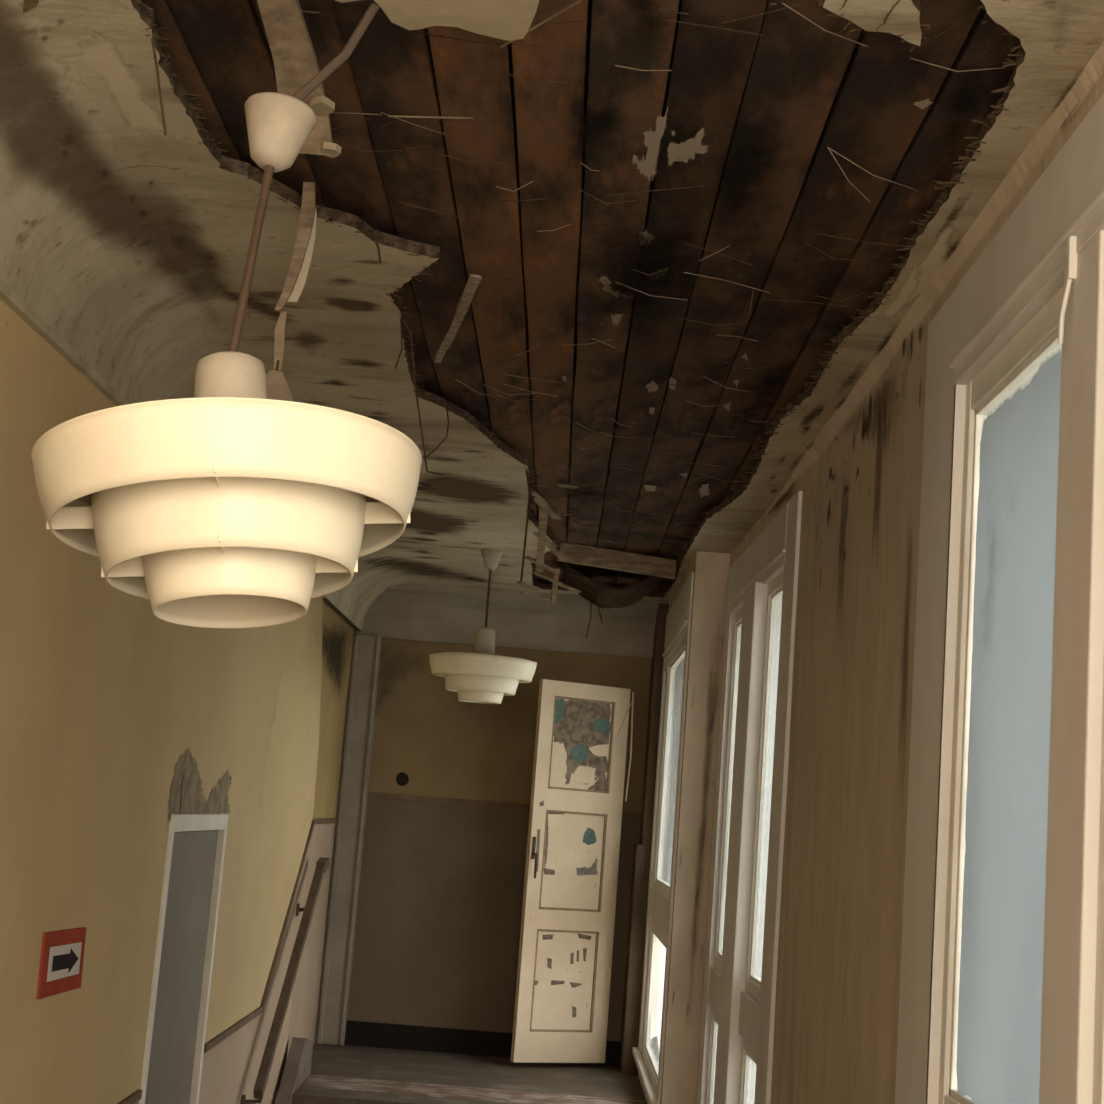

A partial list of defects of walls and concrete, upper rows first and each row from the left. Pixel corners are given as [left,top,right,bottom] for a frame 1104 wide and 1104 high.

crack [876,0,900,32]
flaking render [66,35,174,139]
leakage [0,9,297,321]
leakage [328,300,374,311]
spalling [136,0,1023,609]
leakage [853,319,926,450]
leakage [360,473,515,583]
leakage [322,626,346,688]
flaking render [168,748,232,822]
peeling [550,699,611,791]